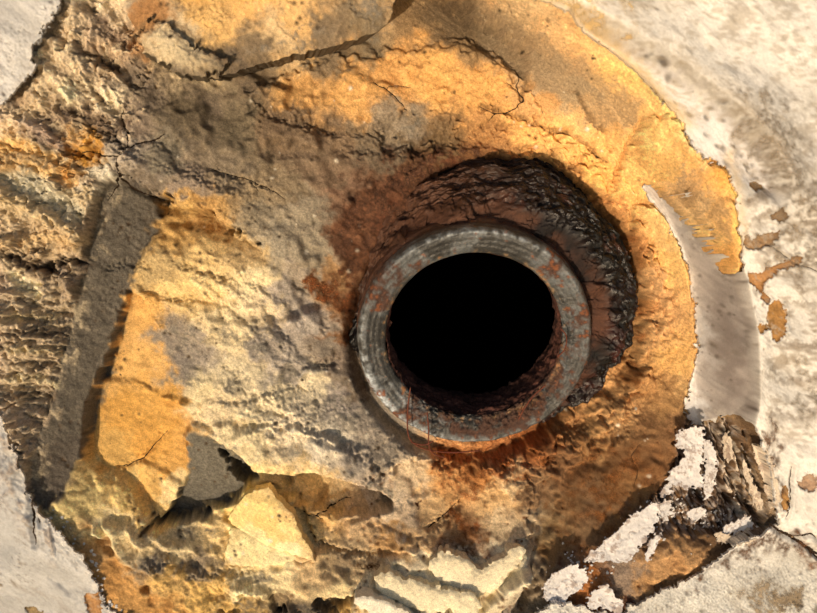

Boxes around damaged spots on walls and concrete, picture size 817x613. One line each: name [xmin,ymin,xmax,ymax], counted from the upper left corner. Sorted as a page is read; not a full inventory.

corrosion [302,147,483,347]
peeling [743,207,789,250]
peeling [748,256,804,343]
peeling [541,425,790,613]
crack [769,466,817,558]
peeling [797,474,817,493]
peeling [84,592,103,613]